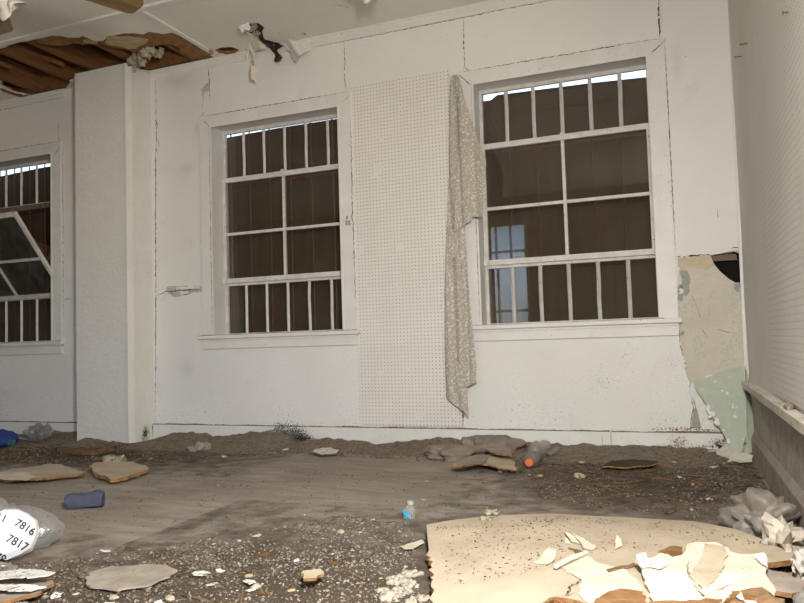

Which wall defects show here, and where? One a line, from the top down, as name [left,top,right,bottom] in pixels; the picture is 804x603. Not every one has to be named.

flaking render [676,250,744,418]